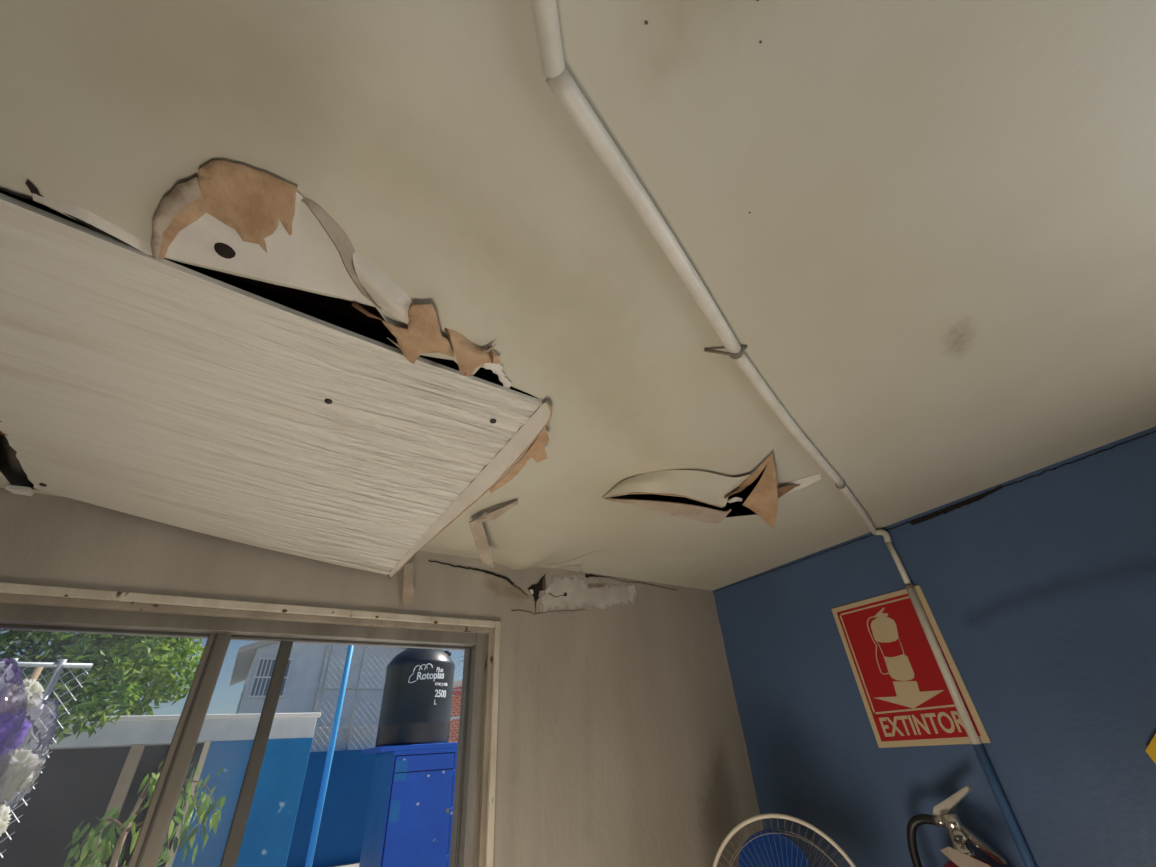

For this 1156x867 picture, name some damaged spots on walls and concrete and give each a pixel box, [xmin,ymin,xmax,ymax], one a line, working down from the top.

peeling [4,485,34,496]
peeling [389,402,550,605]
flaking render [528,566,636,612]